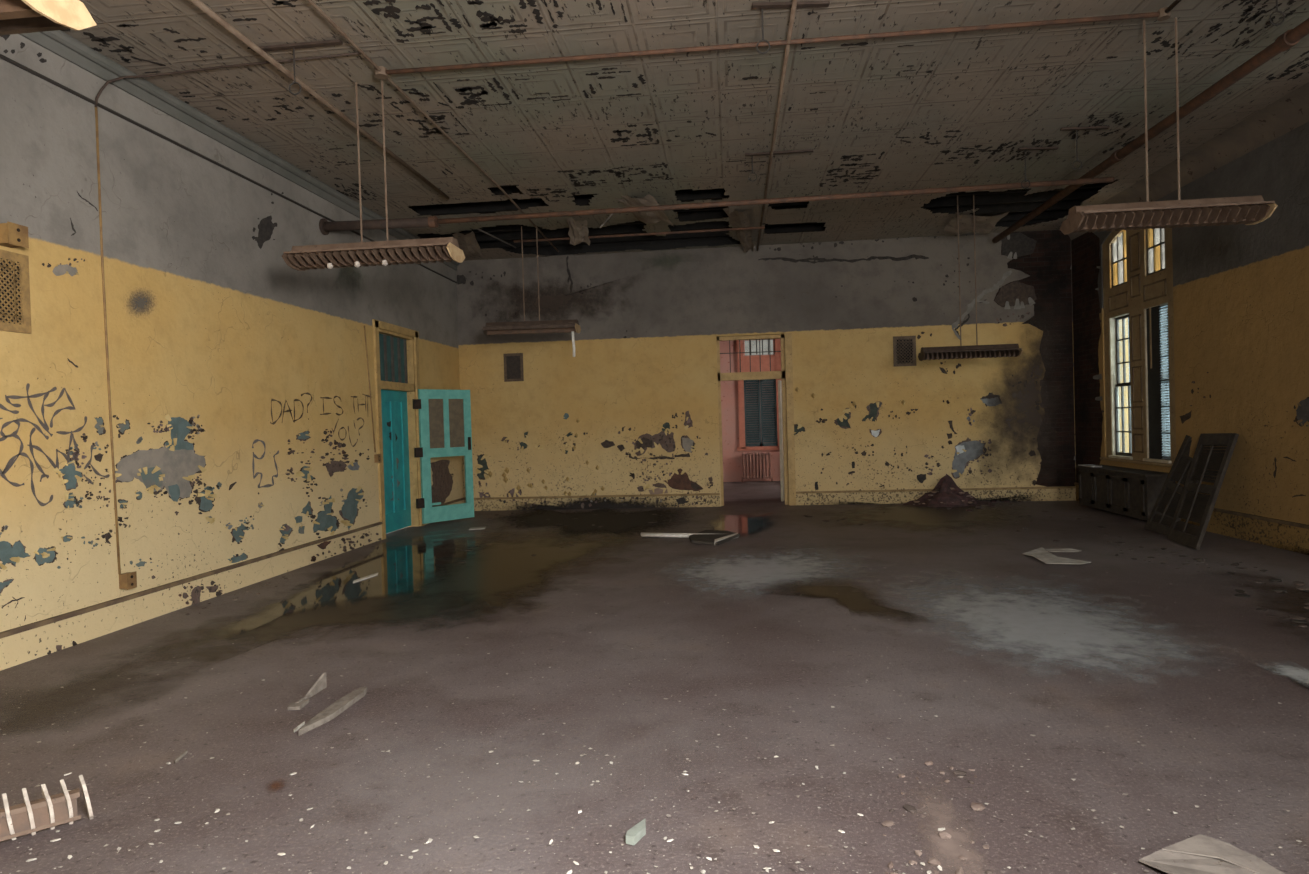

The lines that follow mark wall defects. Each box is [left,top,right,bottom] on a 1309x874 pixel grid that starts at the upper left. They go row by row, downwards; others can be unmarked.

peeling [61,24,166,73]
peeling [252,192,284,249]
peeling [0,414,237,594]
peeling [225,516,254,564]
spalling [475,411,713,509]
leakage [507,497,683,578]
peeling [794,393,999,490]
leakage [981,317,1062,477]
flaking render [994,219,1104,487]
spalling [179,581,222,605]
leakage [186,541,498,661]
leakage [665,548,1195,677]